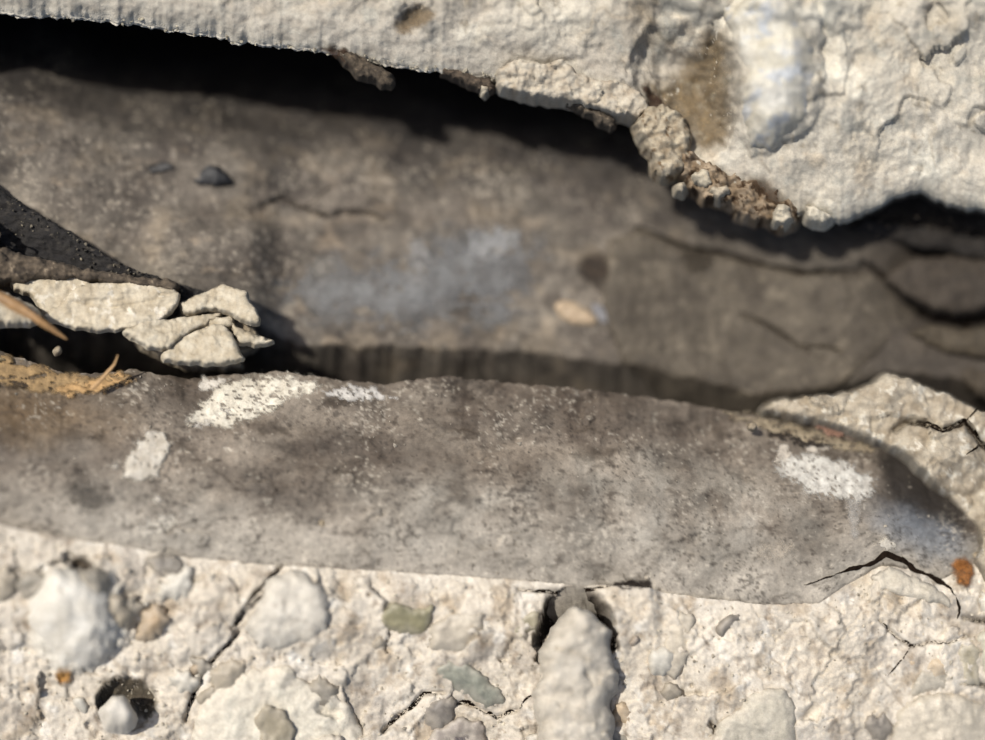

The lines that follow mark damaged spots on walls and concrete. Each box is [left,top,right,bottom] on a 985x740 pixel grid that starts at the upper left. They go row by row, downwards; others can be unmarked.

spalling [322,46,362,61]
spalling [643,86,663,107]
crack [657,235,887,280]
peeling [0,355,132,397]
peeling [601,216,985,582]
crack [899,408,985,455]
peeling [113,431,170,481]
spalling [66,559,93,570]
spalling [614,580,651,589]
crack [806,551,985,674]